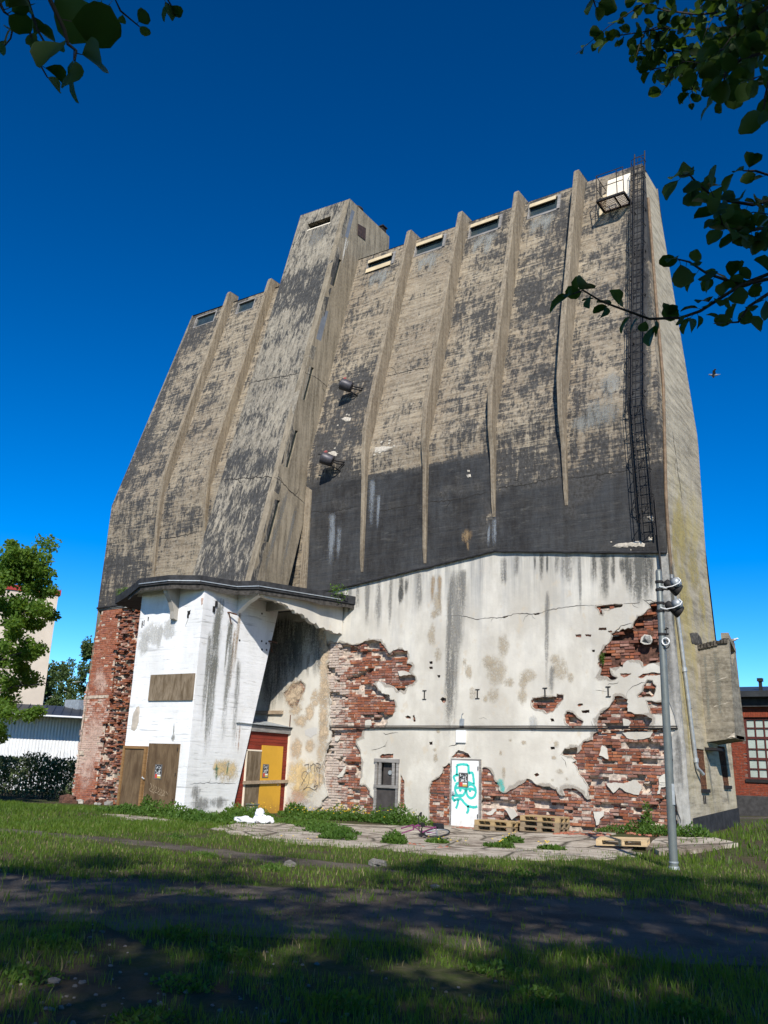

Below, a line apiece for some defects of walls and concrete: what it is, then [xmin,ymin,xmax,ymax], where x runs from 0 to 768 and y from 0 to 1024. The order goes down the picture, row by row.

water stain [329,516,340,555]
water stain [369,481,380,519]
water stain [204,602,239,729]
water stain [343,572,471,703]
crack [450,605,588,621]
water stain [534,555,653,598]
flaking render [283,629,417,814]
flaking render [481,600,679,834]
flaking render [428,750,471,825]